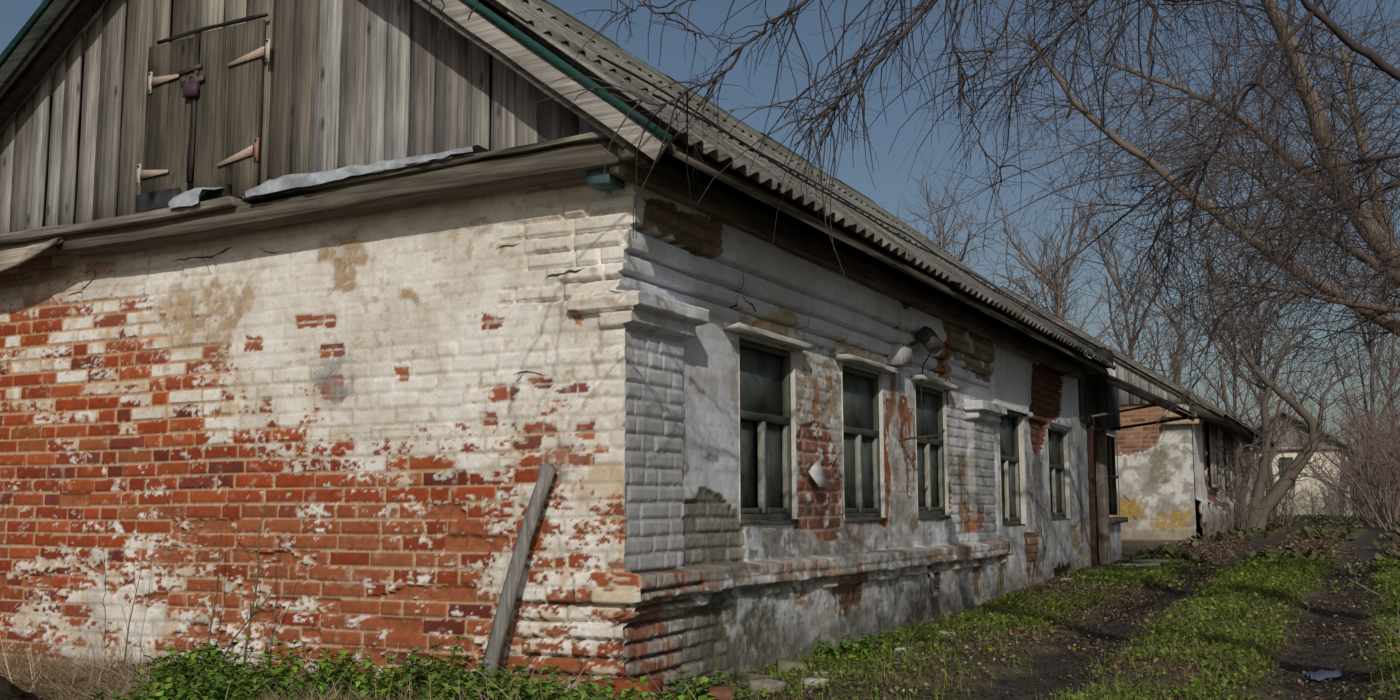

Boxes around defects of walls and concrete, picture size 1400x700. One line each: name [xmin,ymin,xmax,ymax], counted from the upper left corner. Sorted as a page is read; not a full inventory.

flaking render [635,197,723,259]
flaking render [1028,362,1064,462]
peeling [1107,401,1166,457]
leakage [1151,445,1169,484]
peeling [0,294,641,698]
peeling [676,307,884,688]
leakage [907,587,940,627]